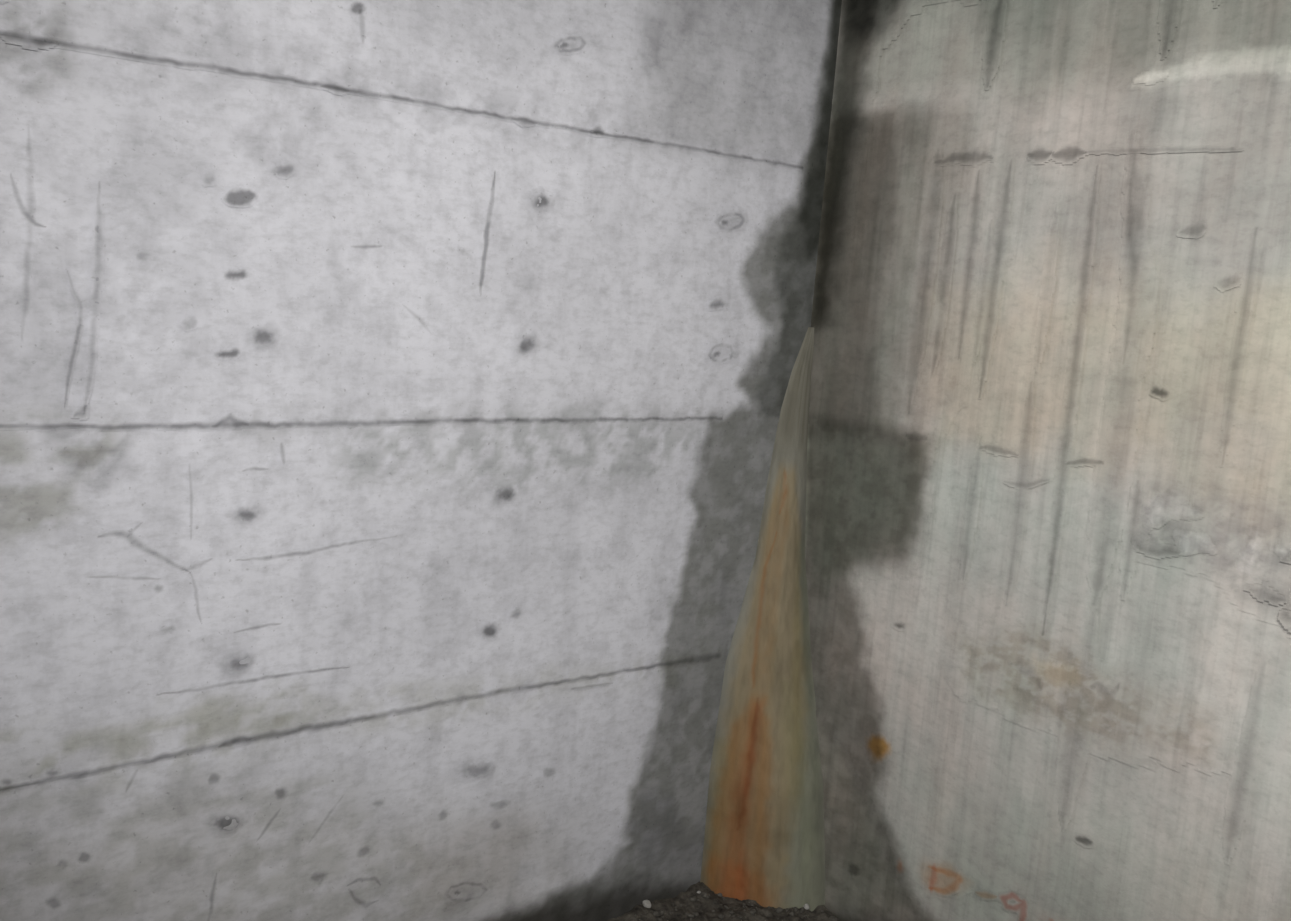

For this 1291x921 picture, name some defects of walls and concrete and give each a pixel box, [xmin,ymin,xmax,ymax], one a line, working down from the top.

leakage [1157,0,1181,60]
leakage [443,0,1045,921]
rust [700,456,813,908]
rust [864,731,894,766]
leakage [942,130,1268,865]